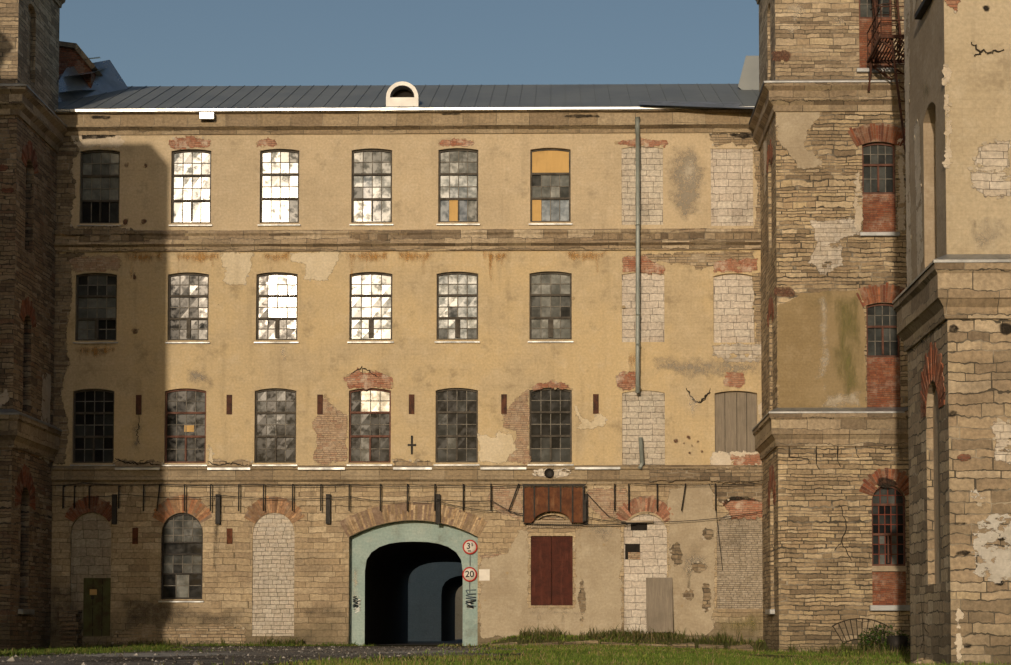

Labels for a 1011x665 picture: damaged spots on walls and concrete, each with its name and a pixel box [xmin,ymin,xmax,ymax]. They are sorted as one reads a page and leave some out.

crack [971,42,1004,57]
flaking render [942,63,952,169]
spalling [968,139,1011,199]
flaking render [220,251,254,286]
flaking render [290,251,341,281]
spalling [312,394,348,466]
spalling [477,379,573,478]
flaking render [574,405,608,430]
crack [686,388,711,403]
flaking render [478,485,654,639]
flaking render [648,436,763,636]